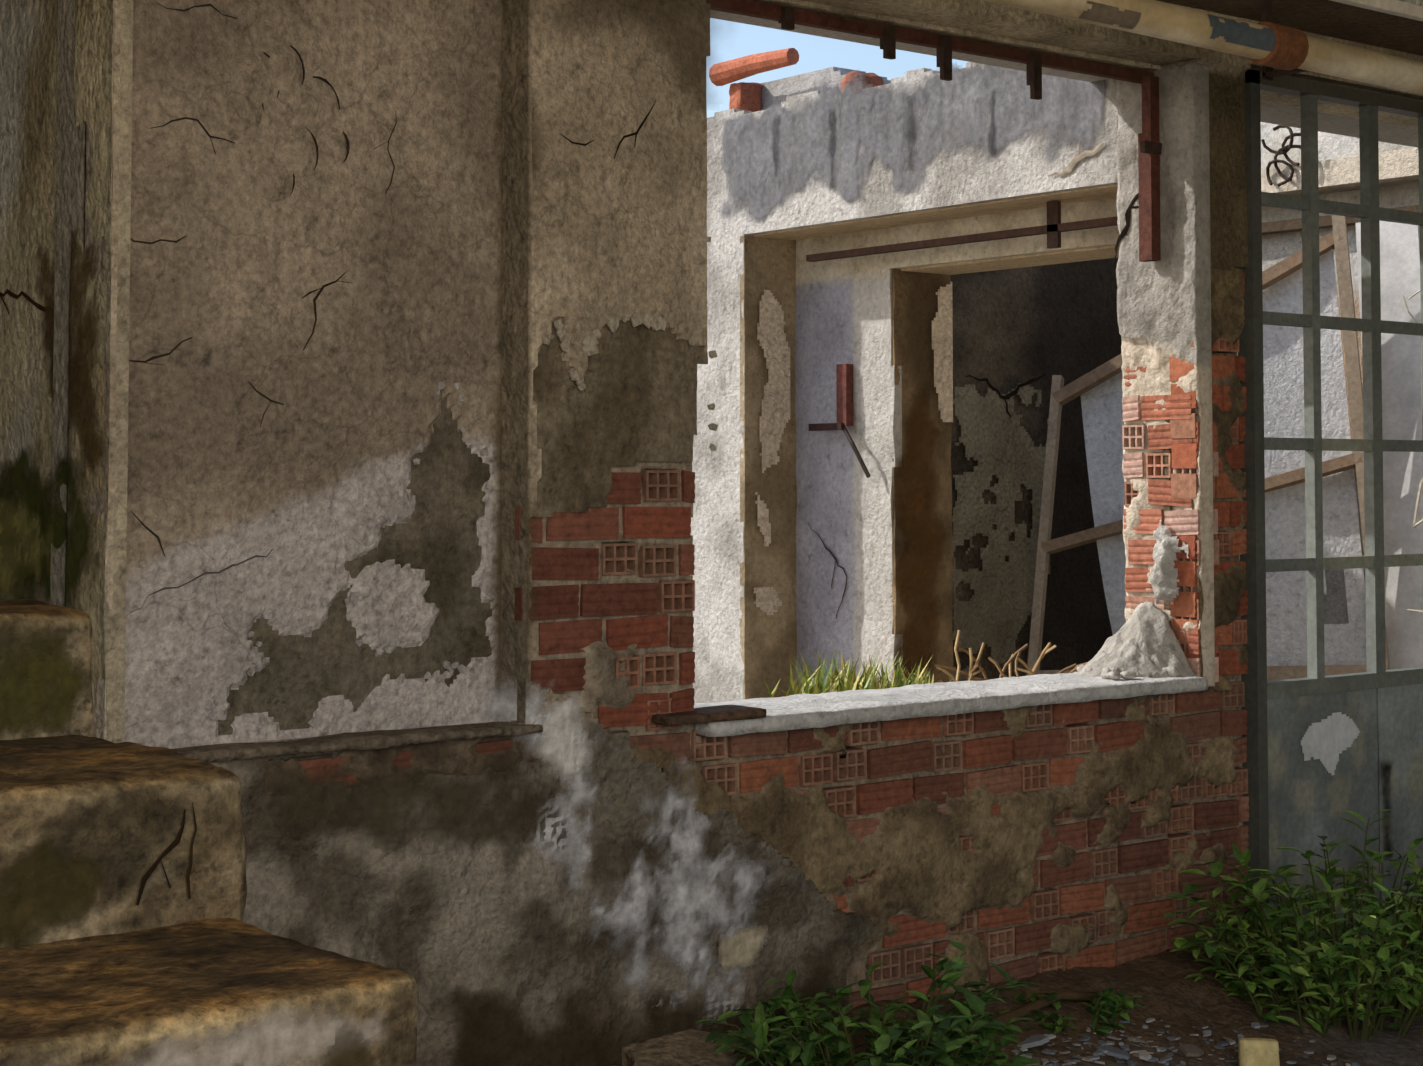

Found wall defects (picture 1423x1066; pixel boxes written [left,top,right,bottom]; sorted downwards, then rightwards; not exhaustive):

crack [156,2,238,19]
peeling [1078,1,1141,29]
crack [149,117,235,155]
crack [374,117,397,194]
crack [130,236,186,244]
crack [0,289,45,315]
crack [302,271,351,351]
crack [129,337,192,365]
flaking render [208,381,492,736]
flaking render [514,267,1250,1009]
damp [269,690,596,886]
damp [454,793,827,1066]